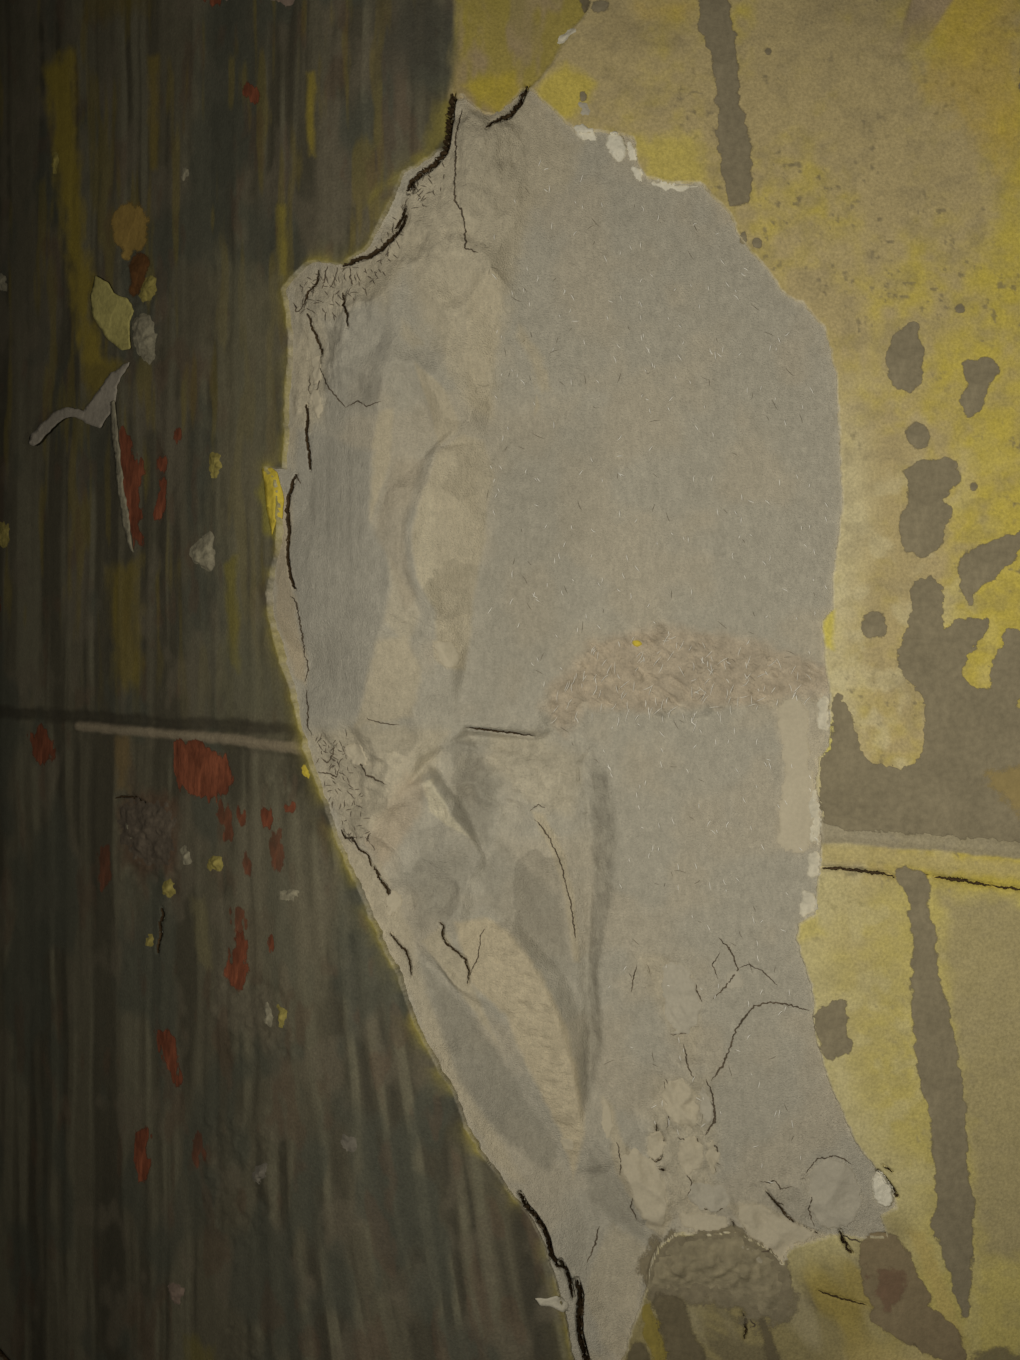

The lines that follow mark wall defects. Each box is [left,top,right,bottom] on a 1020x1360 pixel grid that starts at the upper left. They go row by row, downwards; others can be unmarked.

peeling [28,275,158,552]
crack [284,86,532,784]
flaking render [262,0,1020,1360]
crack [822,866,894,878]
crack [926,874,1020,890]
crack [653,938,809,1265]
crack [519,1193,600,1360]
crack [743,1313,756,1339]
crack [760,1155,898,1253]
crack [819,1290,866,1305]